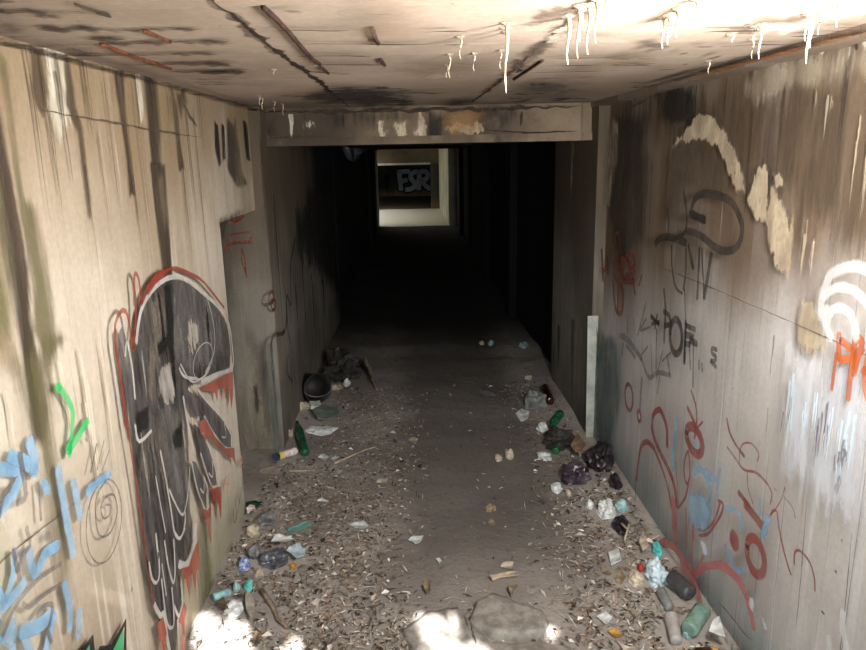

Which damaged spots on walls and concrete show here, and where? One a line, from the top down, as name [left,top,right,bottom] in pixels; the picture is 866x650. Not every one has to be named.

crack [207,0,673,134]
corrosion [632,32,865,88]
water stain [735,1,866,35]
water stain [607,44,859,257]
water stain [846,116,866,247]